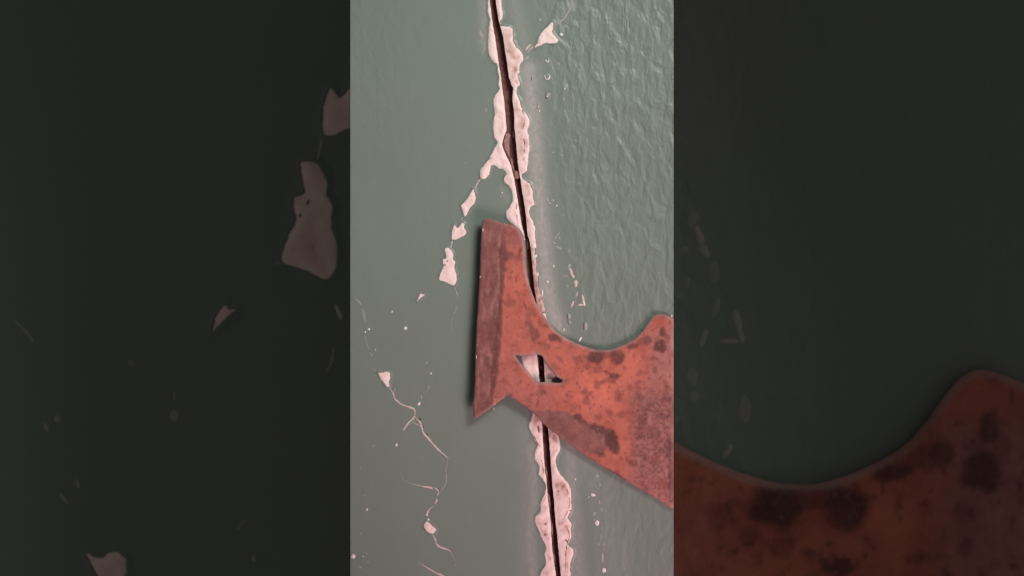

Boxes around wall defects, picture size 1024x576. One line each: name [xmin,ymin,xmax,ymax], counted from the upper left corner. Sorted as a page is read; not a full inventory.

peeling [437,0,573,332]
crack [490,0,537,304]
peeling [519,354,557,383]
crack [537,354,545,382]
crack [542,423,561,576]
peeling [527,410,606,576]